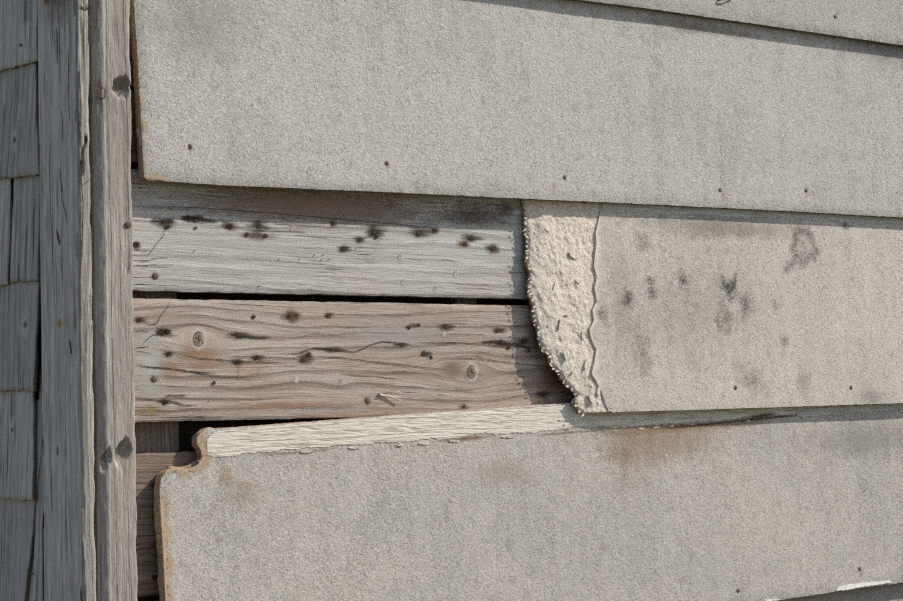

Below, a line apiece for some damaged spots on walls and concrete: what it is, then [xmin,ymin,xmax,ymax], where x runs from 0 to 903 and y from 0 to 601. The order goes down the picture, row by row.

peeling [155,199,903,486]
peeling [835,581,890,591]